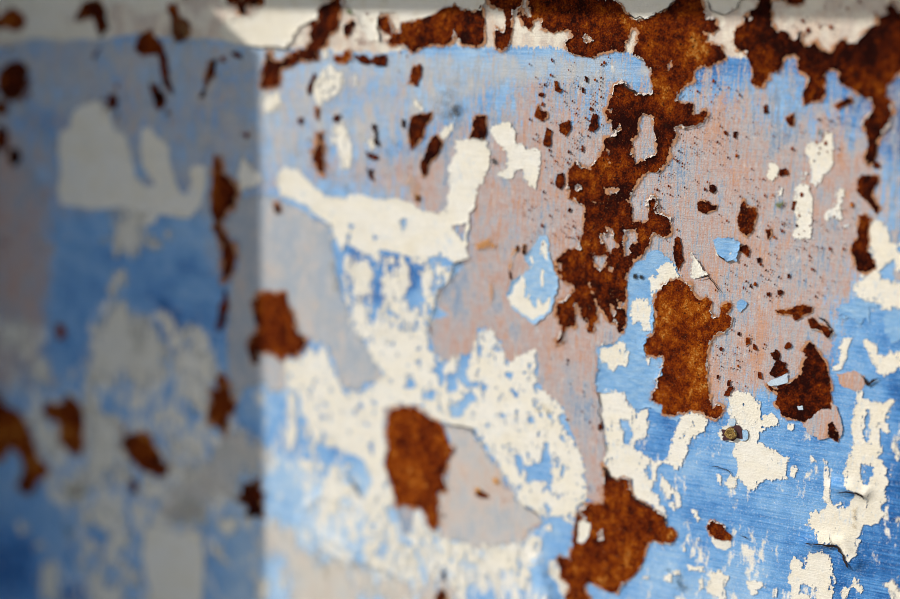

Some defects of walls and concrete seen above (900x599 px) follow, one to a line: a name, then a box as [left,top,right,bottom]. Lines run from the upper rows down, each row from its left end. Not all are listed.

corrosion [134,29,173,123]
peeling [57,100,206,259]
corrosion [209,154,241,331]
corrosion [258,0,900,442]
corrosion [246,289,309,365]
peeling [226,120,708,599]
peeling [141,523,229,599]
corrosion [384,405,456,532]
corrosion [556,461,678,599]
peeling [664,564,729,599]
peeling [711,536,731,550]
peeling [716,337,900,599]